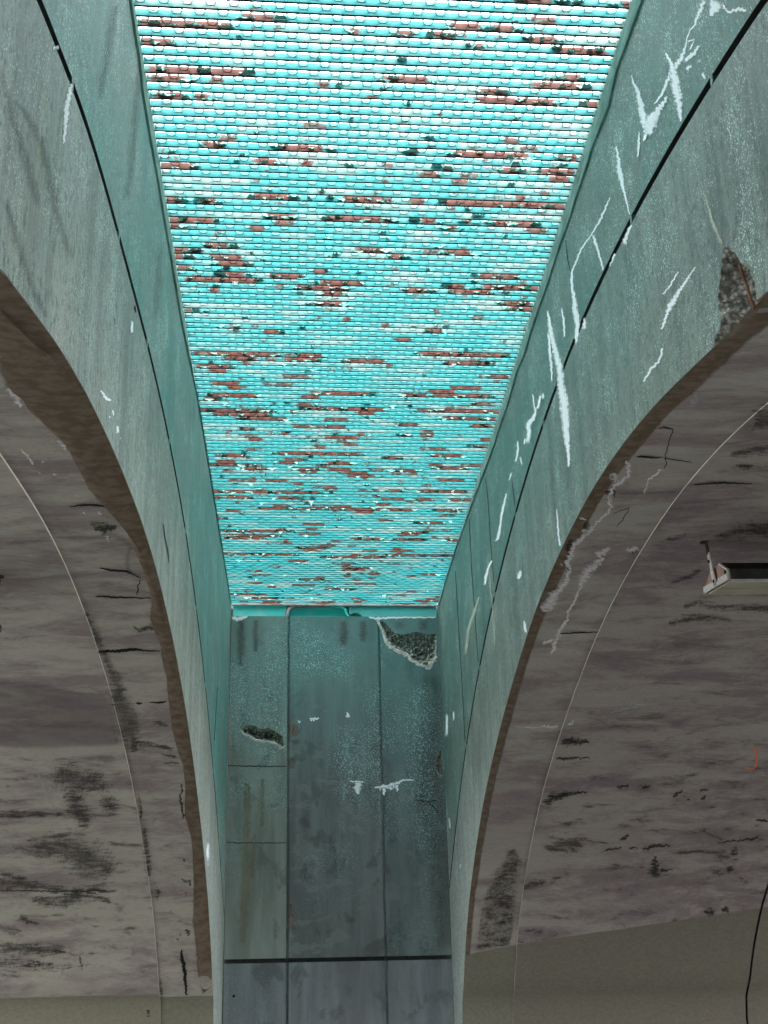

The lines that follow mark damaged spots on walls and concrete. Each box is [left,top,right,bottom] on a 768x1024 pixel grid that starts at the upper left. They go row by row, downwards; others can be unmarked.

crack [631,0,746,157]
crack [565,197,610,343]
spalling [714,247,758,345]
crack [540,427,752,654]
spalling [369,616,437,670]
water stain [458,292,768,955]
spalling [240,725,284,750]